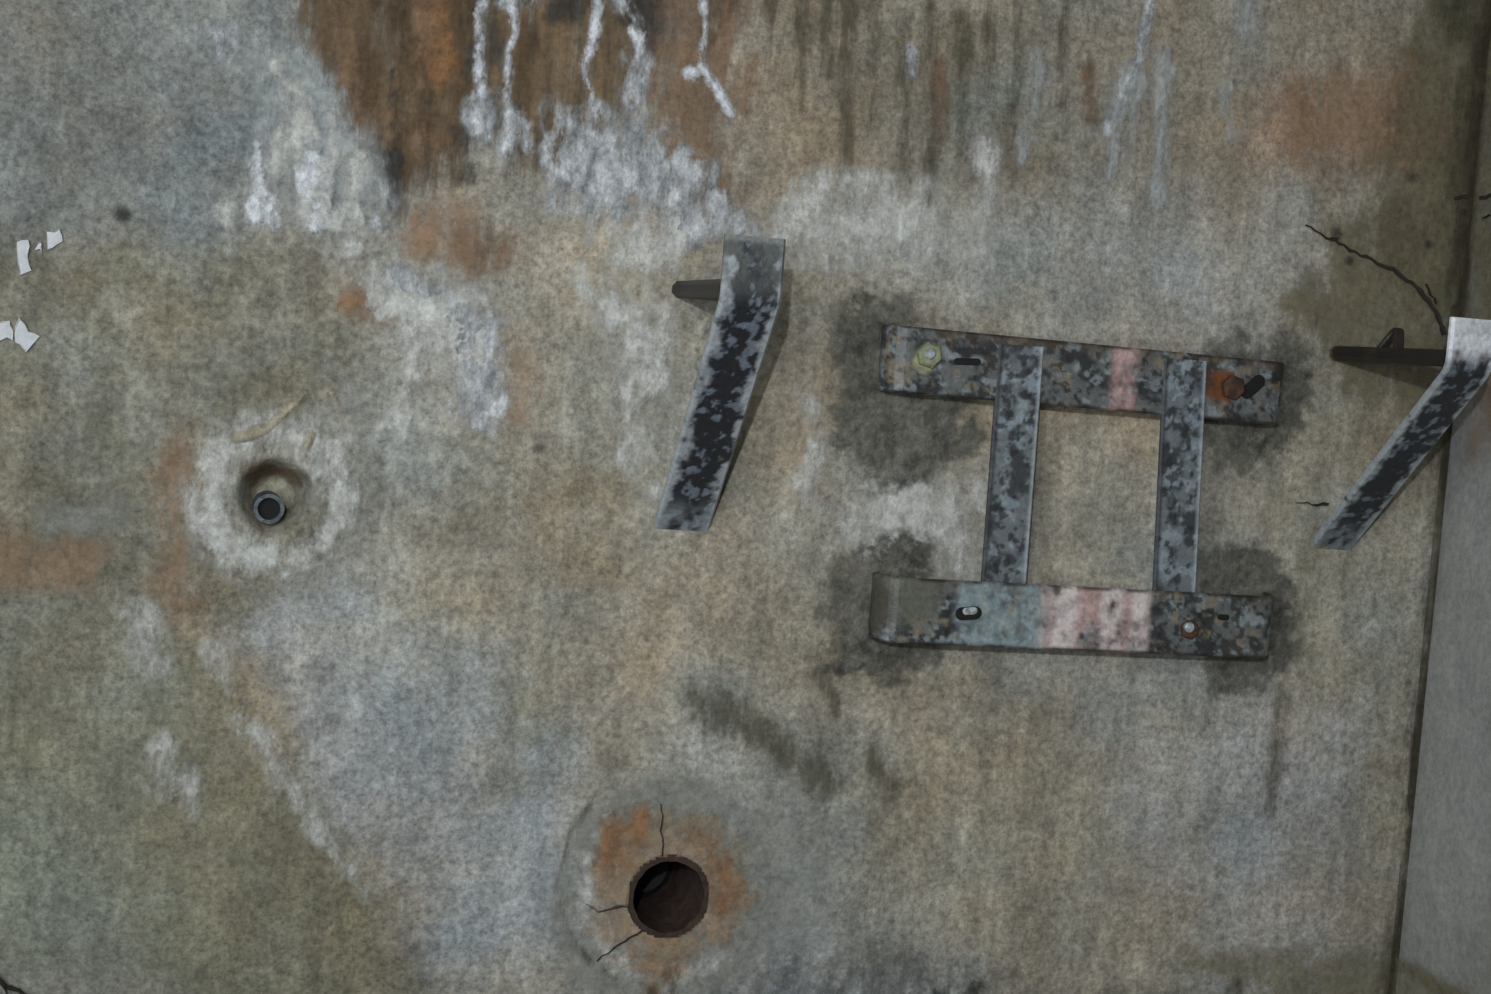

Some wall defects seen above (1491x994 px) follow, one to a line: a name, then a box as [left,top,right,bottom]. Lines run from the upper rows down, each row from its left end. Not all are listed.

leakage [462,0,945,274]
leakage [971,136,998,260]
crack [1306,0,1491,336]
leakage [569,263,673,473]
leakage [792,395,826,502]
leakage [844,468,986,573]
crack [1442,422,1453,513]
crack [1388,554,1439,994]
crack [0,978,27,994]